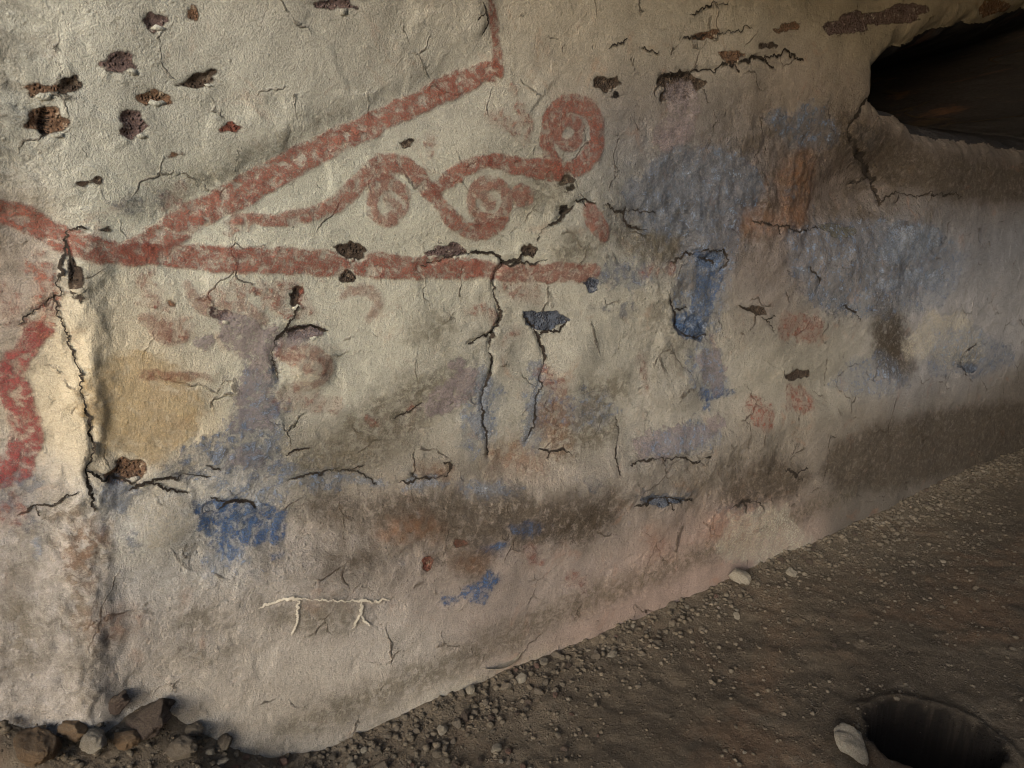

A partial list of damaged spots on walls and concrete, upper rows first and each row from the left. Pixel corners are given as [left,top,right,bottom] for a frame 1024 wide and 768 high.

spalling [98,51,138,76]
crack [609,0,804,77]
spalling [822,3,929,36]
spalling [23,75,82,138]
spalling [119,68,217,140]
crack [420,198,656,459]
spalling [523,310,570,334]
crack [17,225,256,516]
spalling [103,456,147,485]
crack [286,447,453,485]
crack [615,419,712,479]
crack [258,596,389,635]